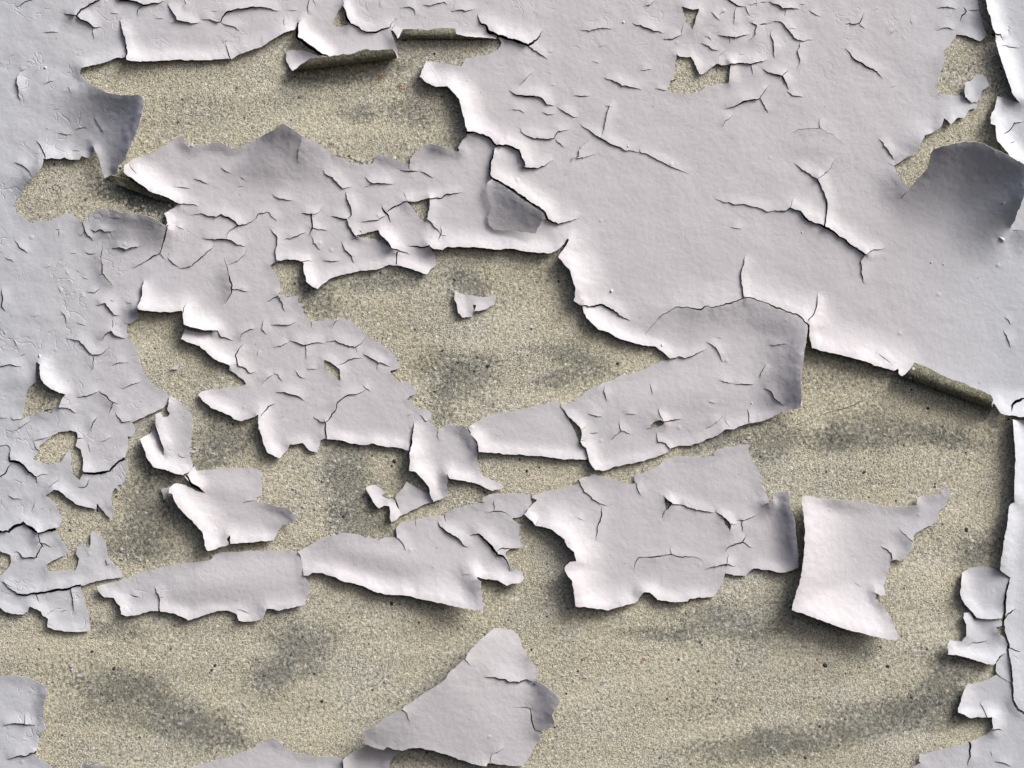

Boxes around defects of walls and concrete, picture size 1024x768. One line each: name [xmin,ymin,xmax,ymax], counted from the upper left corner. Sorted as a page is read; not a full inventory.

crack [342,0,688,225]
crack [635,0,818,125]
peeling [894,0,1024,235]
crack [0,160,462,559]
peeling [14,0,669,433]
crack [583,264,818,332]
crack [671,338,885,428]
crack [716,119,884,283]
peeling [0,294,1024,768]
crack [578,480,606,536]
crack [634,483,768,568]